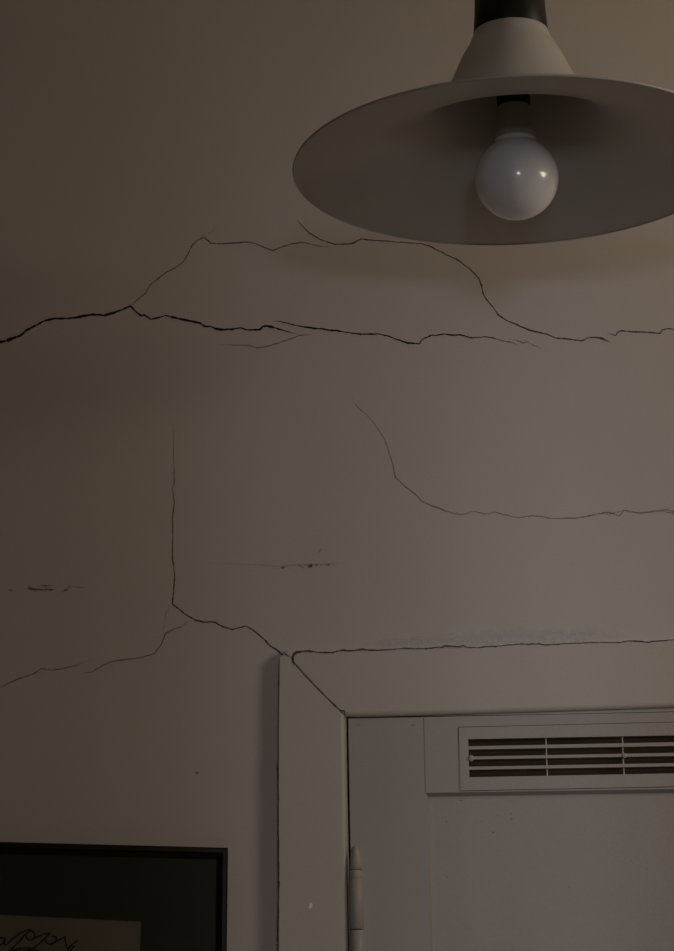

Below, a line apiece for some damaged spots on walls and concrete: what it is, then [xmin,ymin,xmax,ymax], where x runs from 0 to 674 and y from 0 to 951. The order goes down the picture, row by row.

crack [0,223,674,348]
crack [0,479,674,715]
crack [274,762,282,951]